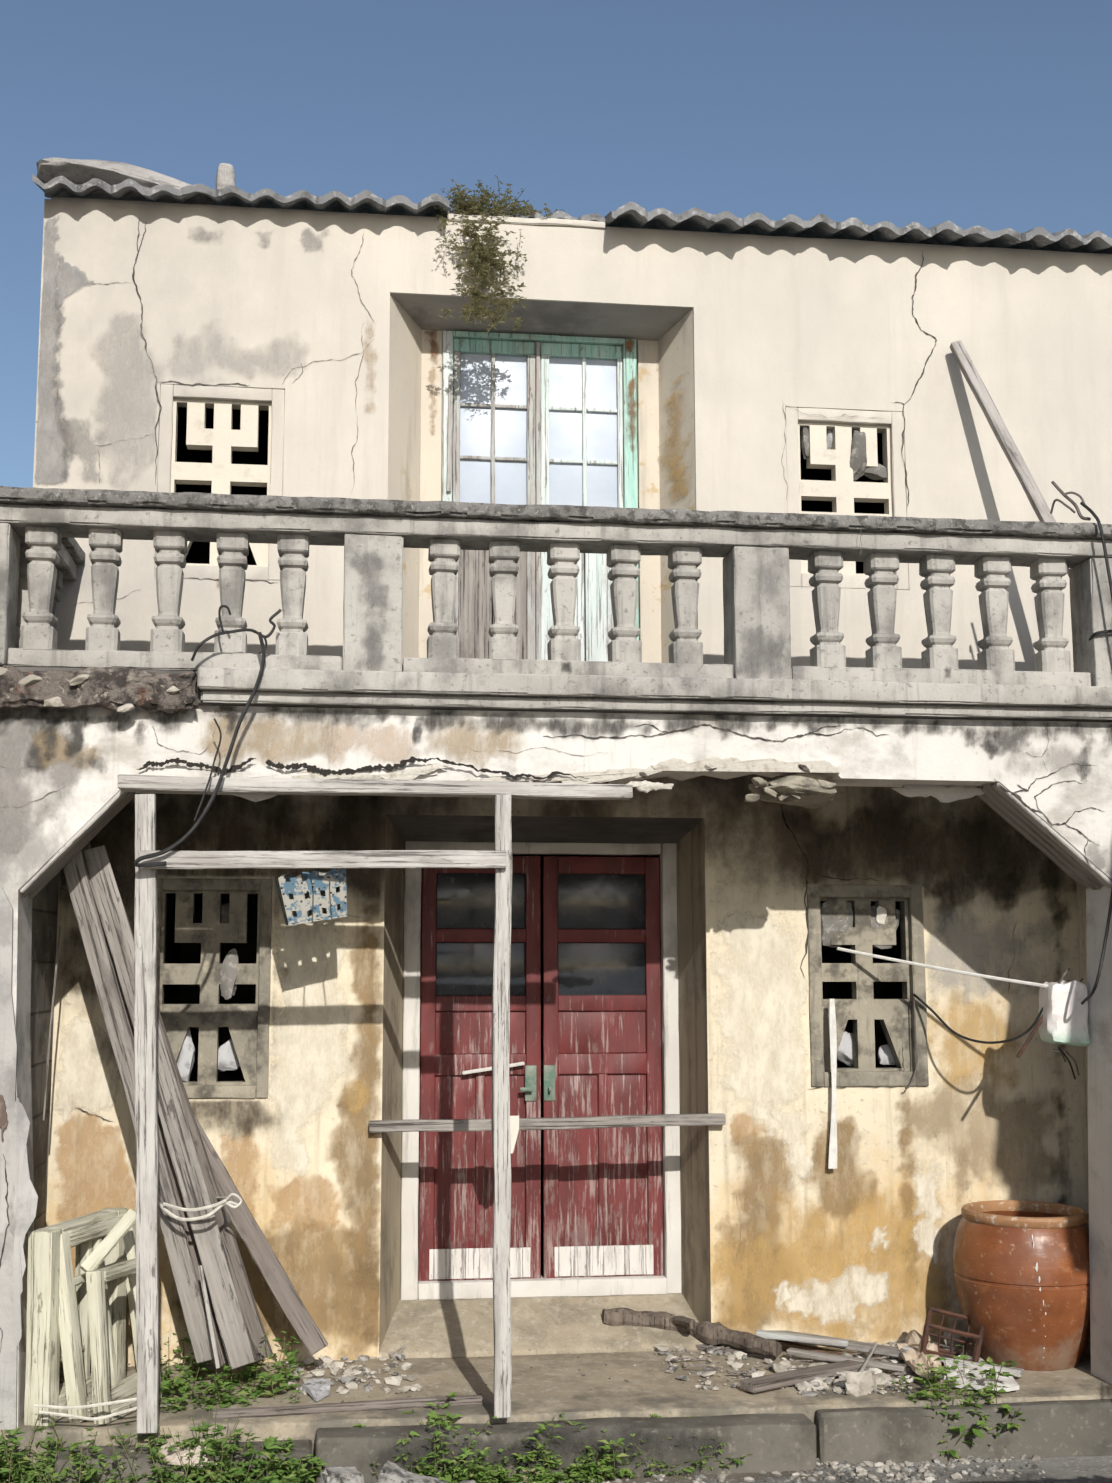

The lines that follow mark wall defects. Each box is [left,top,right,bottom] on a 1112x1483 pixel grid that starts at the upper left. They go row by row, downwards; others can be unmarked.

crack [36,219,249,486]
crack [782,250,937,506]
spalling [0,665,198,714]
damp [206,706,695,759]
crack [136,724,889,780]
spalling [465,757,840,809]
crack [995,735,1105,870]
damp [267,909,380,1341]
damp [719,1006,1059,1338]
peeling [871,1227,888,1248]
damp [237,1238,302,1344]
peeling [775,1267,888,1325]